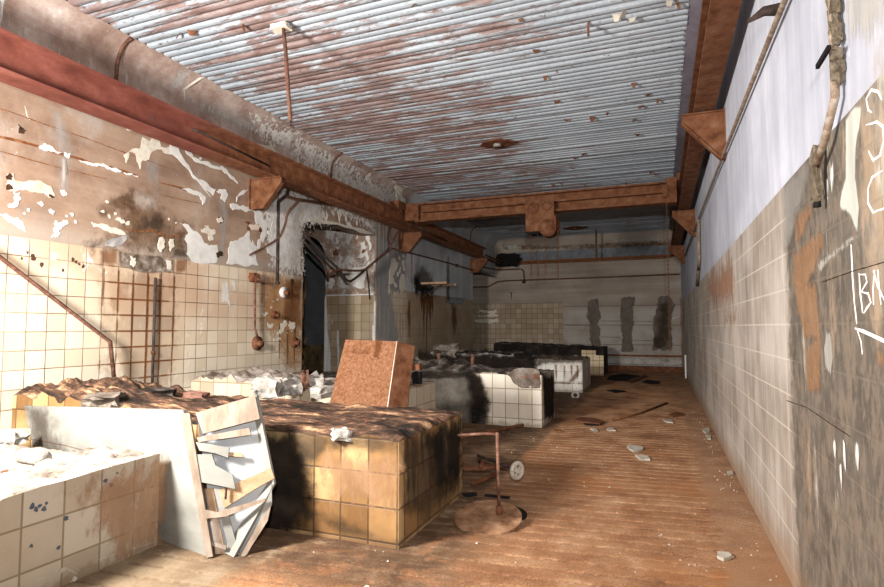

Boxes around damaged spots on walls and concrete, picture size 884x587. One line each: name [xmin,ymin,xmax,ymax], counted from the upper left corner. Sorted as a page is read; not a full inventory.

peeling [170,70,406,203]
peeling [0,173,77,237]
peeling [91,137,377,289]
corrosion [261,274,302,369]
peeling [387,253,406,295]
water stain [833,440,859,488]